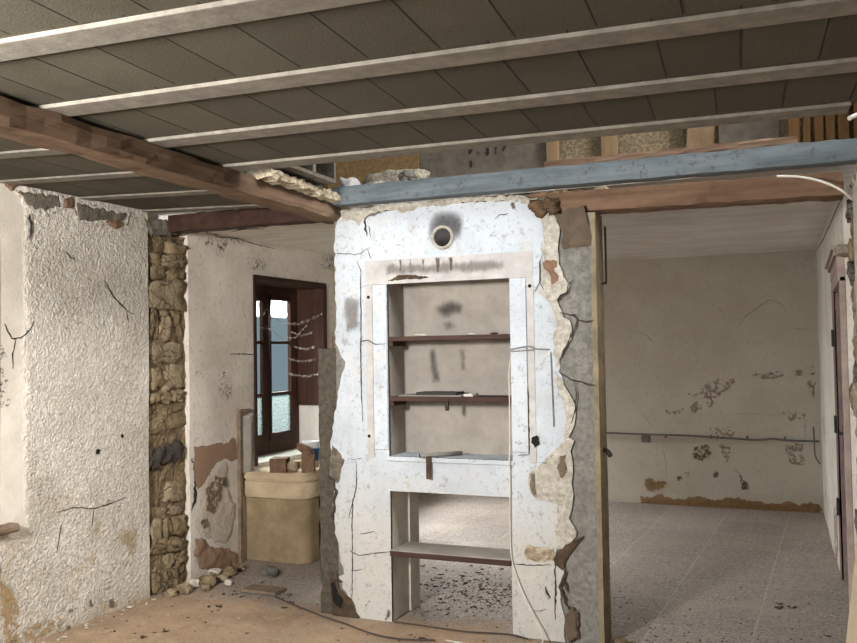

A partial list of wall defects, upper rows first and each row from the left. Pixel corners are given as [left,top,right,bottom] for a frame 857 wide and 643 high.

spalling [4,184,131,229]
crack [104,281,134,320]
crack [5,320,34,363]
crack [534,256,595,423]
flaking render [144,218,238,595]
spalling [524,209,584,570]
peeling [665,378,735,413]
peeling [693,428,734,462]
crack [57,498,123,550]
peeling [564,607,580,643]